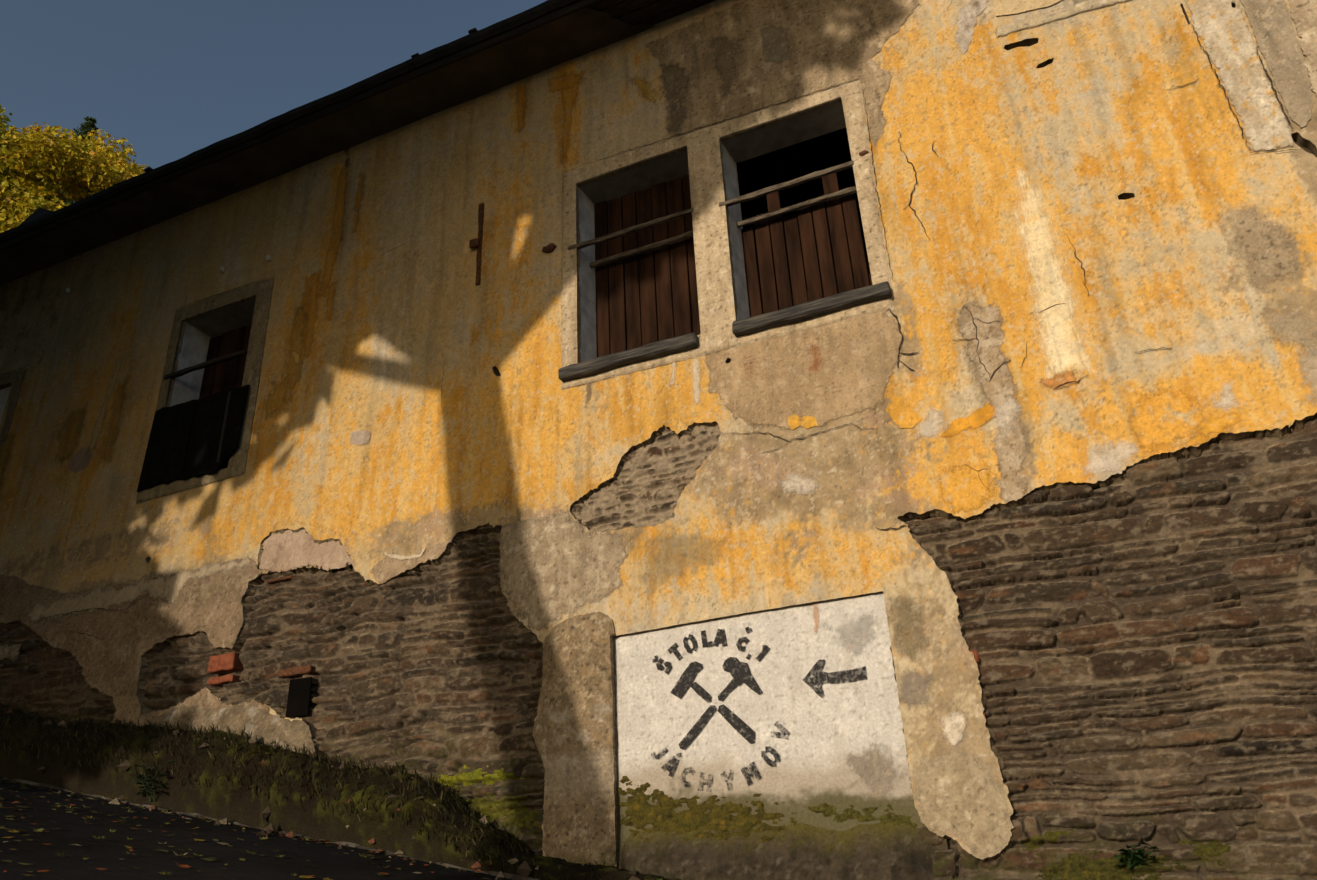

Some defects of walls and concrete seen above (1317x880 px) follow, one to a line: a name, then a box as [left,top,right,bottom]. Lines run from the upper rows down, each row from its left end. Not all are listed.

peeling [1289,0,1317,95]
hole [1291,132,1317,157]
crack [562,78,938,371]
crack [1039,236,1089,313]
crack [952,305,1027,382]
flaking render [569,421,721,532]
flaking render [897,301,1317,880]
flaking render [0,522,545,855]